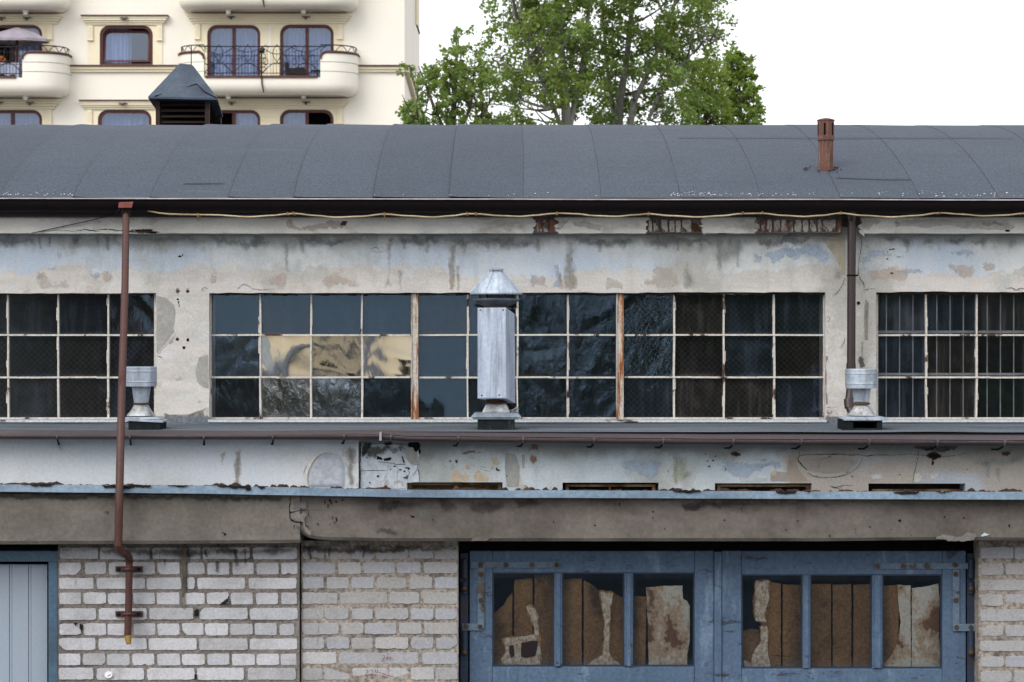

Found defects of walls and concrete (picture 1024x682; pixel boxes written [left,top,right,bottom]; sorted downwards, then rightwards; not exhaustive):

damp [449,240,474,288]
spalling [648,219,691,233]
spalling [755,219,842,262]
damp [825,237,845,275]
peeling [359,442,421,488]
peeling [449,457,527,489]
crack [798,454,873,489]
crack [289,497,319,536]